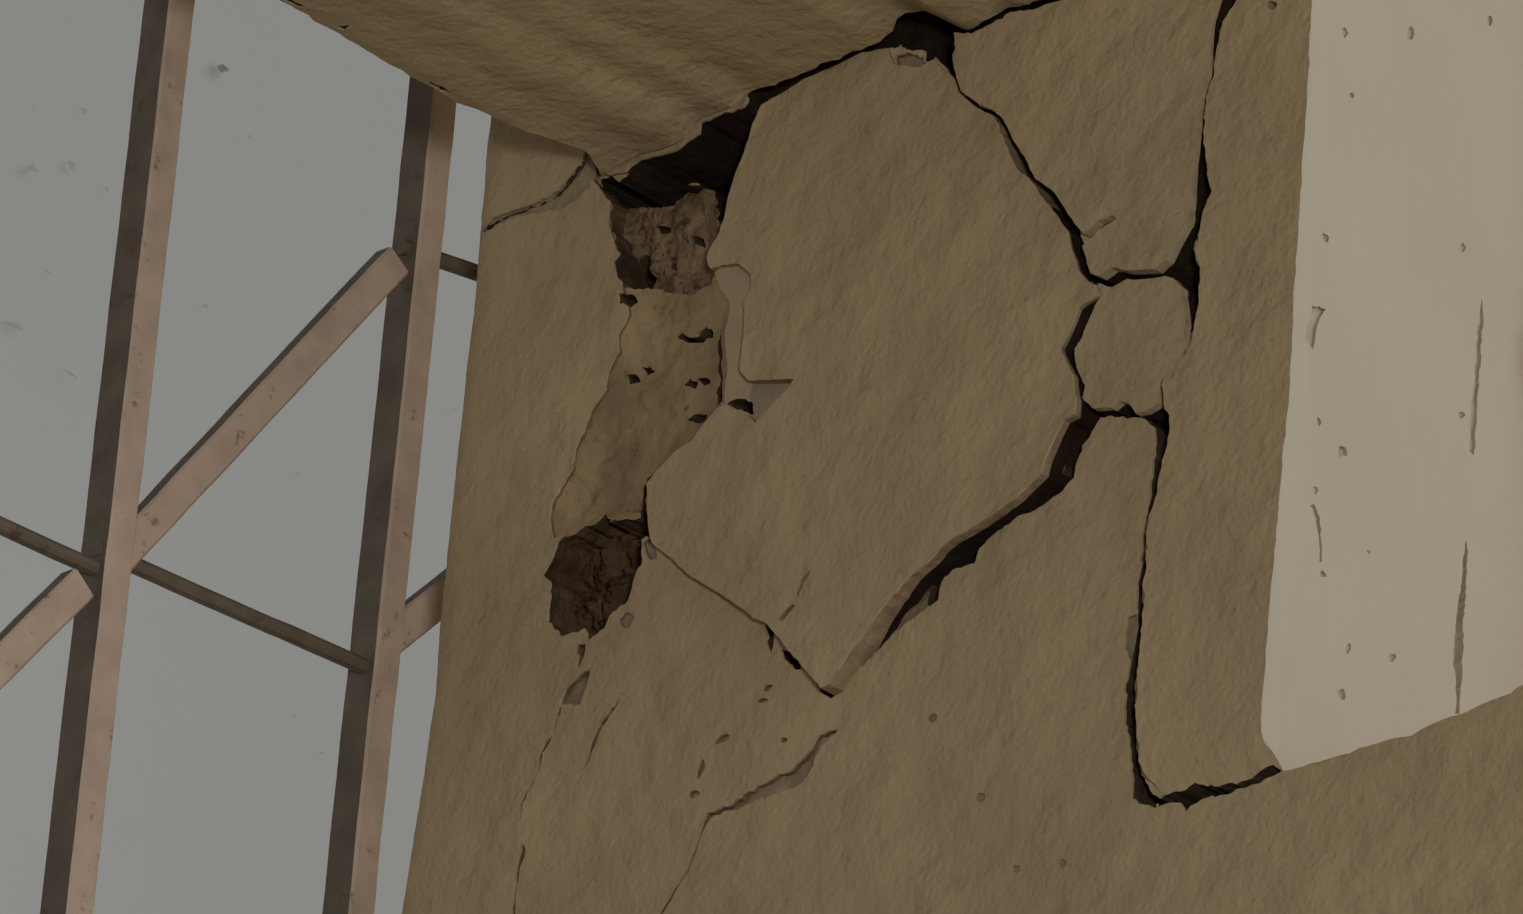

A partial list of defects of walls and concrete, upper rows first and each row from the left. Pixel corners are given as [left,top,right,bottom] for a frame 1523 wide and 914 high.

crack [746,0,1060,108]
crack [980,106,1004,121]
crack [482,152,611,233]
spalling [542,102,790,640]
crack [1469,301,1484,456]
crack [1062,465,1075,479]
crack [619,611,634,628]
crack [765,625,835,698]
crack [890,585,940,637]
crack [1124,420,1281,812]
crack [1453,540,1468,714]
crack [511,644,623,914]